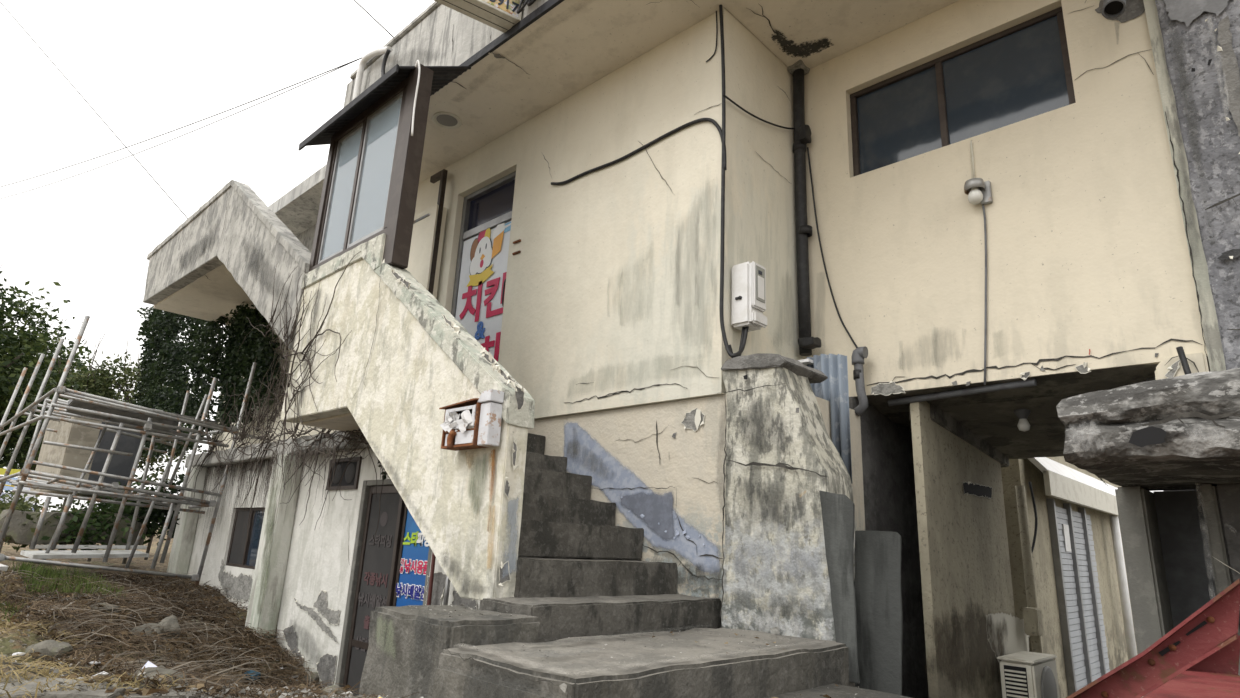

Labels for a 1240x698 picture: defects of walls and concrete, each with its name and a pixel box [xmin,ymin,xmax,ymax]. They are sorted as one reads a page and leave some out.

crack [867,111,1240,386]
flaking render [1217,249,1240,261]
flaking render [672,408,705,438]
crack [565,366,827,615]
peeling [283,590,340,687]